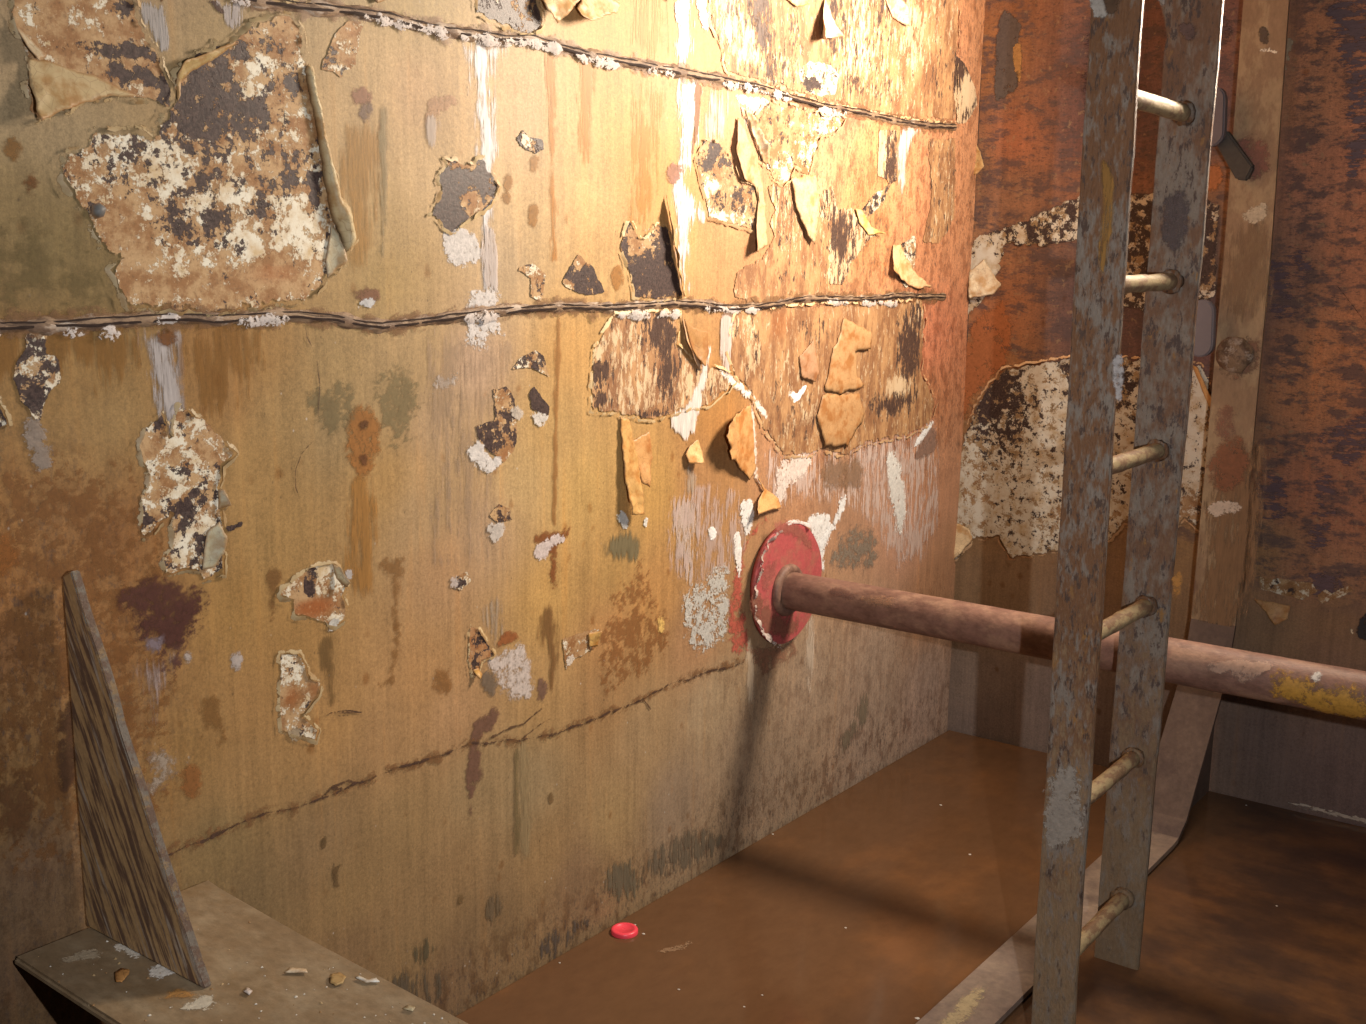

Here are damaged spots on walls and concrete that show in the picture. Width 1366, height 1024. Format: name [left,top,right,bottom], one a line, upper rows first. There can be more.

peeling [7,0,363,317]
leakage [364,13,620,173]
leakage [647,0,792,291]
peeling [588,0,977,515]
peeling [968,195,1080,315]
rust [118,576,205,671]
peeling [135,402,243,584]
rust [345,405,381,594]
leakage [668,467,754,652]
leakage [671,306,938,571]
peeling [954,355,1070,562]
crack [167,658,744,856]